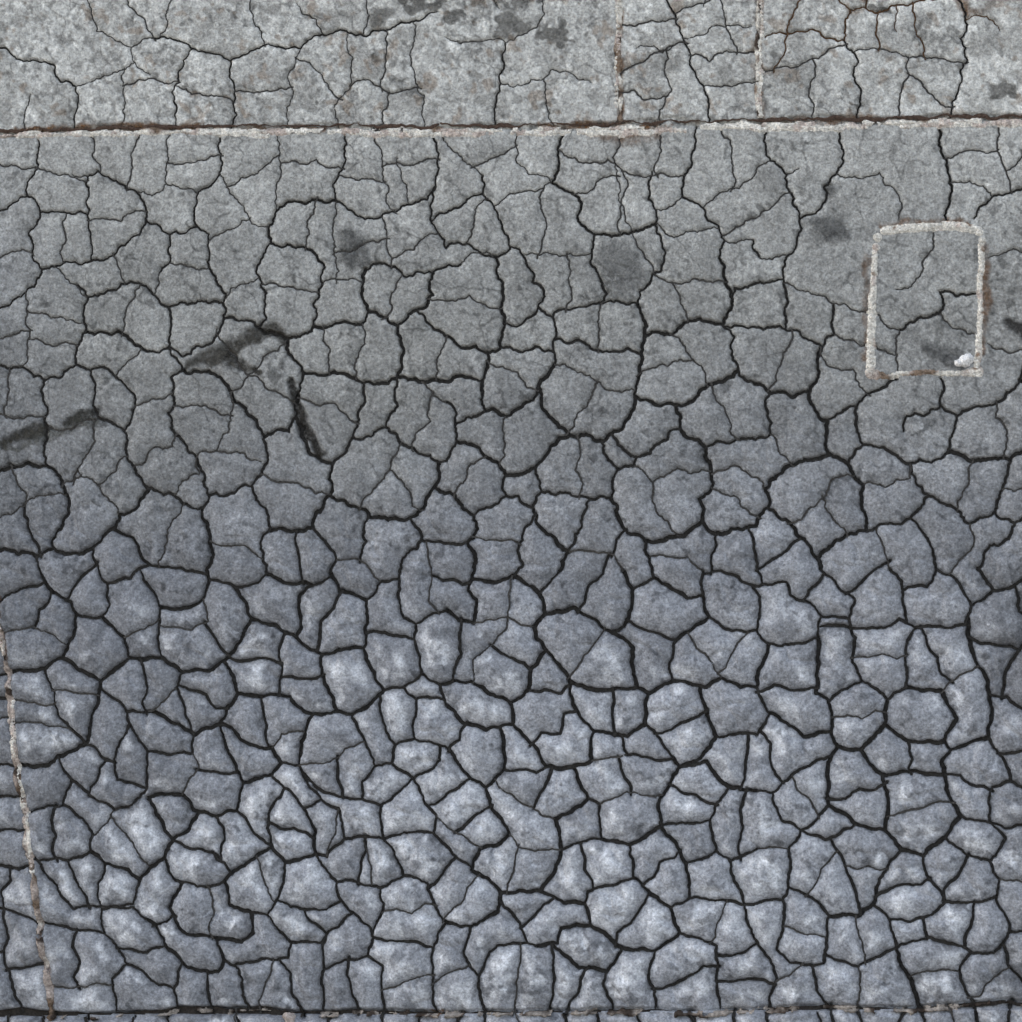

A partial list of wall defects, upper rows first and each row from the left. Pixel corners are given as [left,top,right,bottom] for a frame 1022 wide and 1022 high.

crack [0,0,439,131]
crack [447,0,591,126]
crack [620,0,756,128]
crack [765,0,1000,121]
crack [896,127,1022,290]
crack [876,290,976,371]
crack [987,343,1022,354]
crack [0,127,903,1022]
crack [612,369,1022,1022]